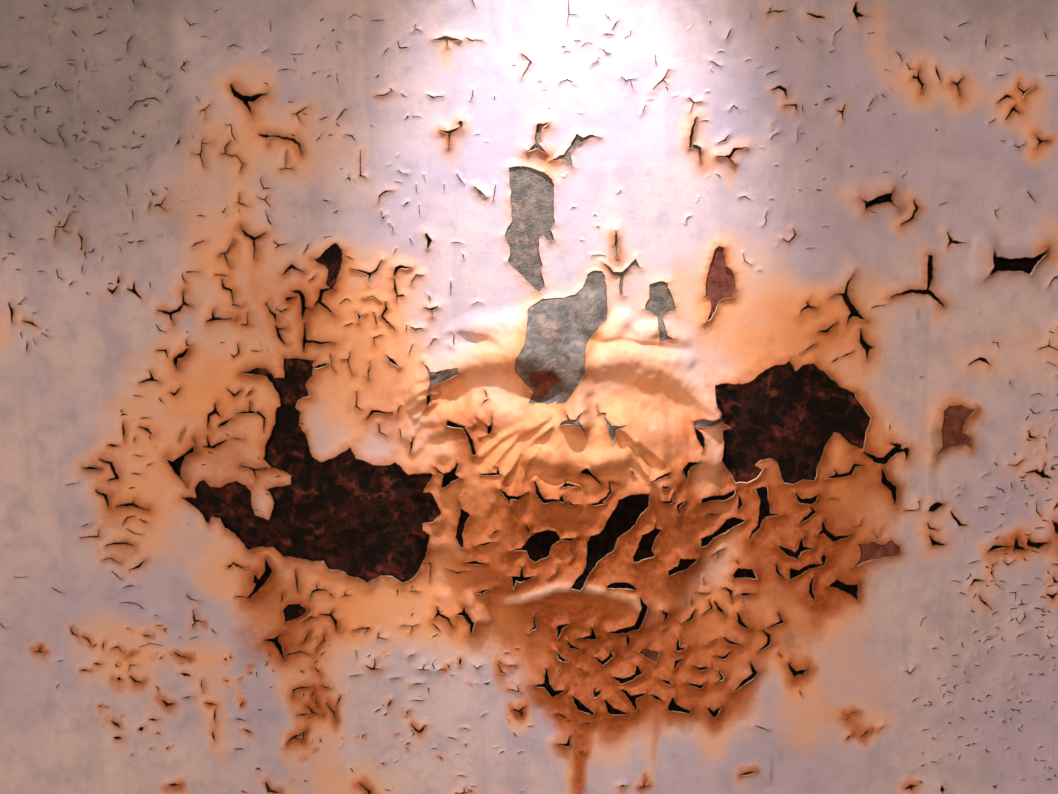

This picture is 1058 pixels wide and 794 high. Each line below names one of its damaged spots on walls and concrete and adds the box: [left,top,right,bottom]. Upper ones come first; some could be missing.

crack [419,22,569,163]
crack [63,64,451,617]
peeling [147,345,504,606]
peeling [486,117,751,456]
peeling [492,164,918,621]
crack [782,181,1058,380]
peeling [956,221,1058,305]
crack [125,418,1058,794]
corrosion [797,579,888,640]
corrosion [282,724,352,778]
corrosion [552,724,664,794]
corrosion [686,694,765,774]